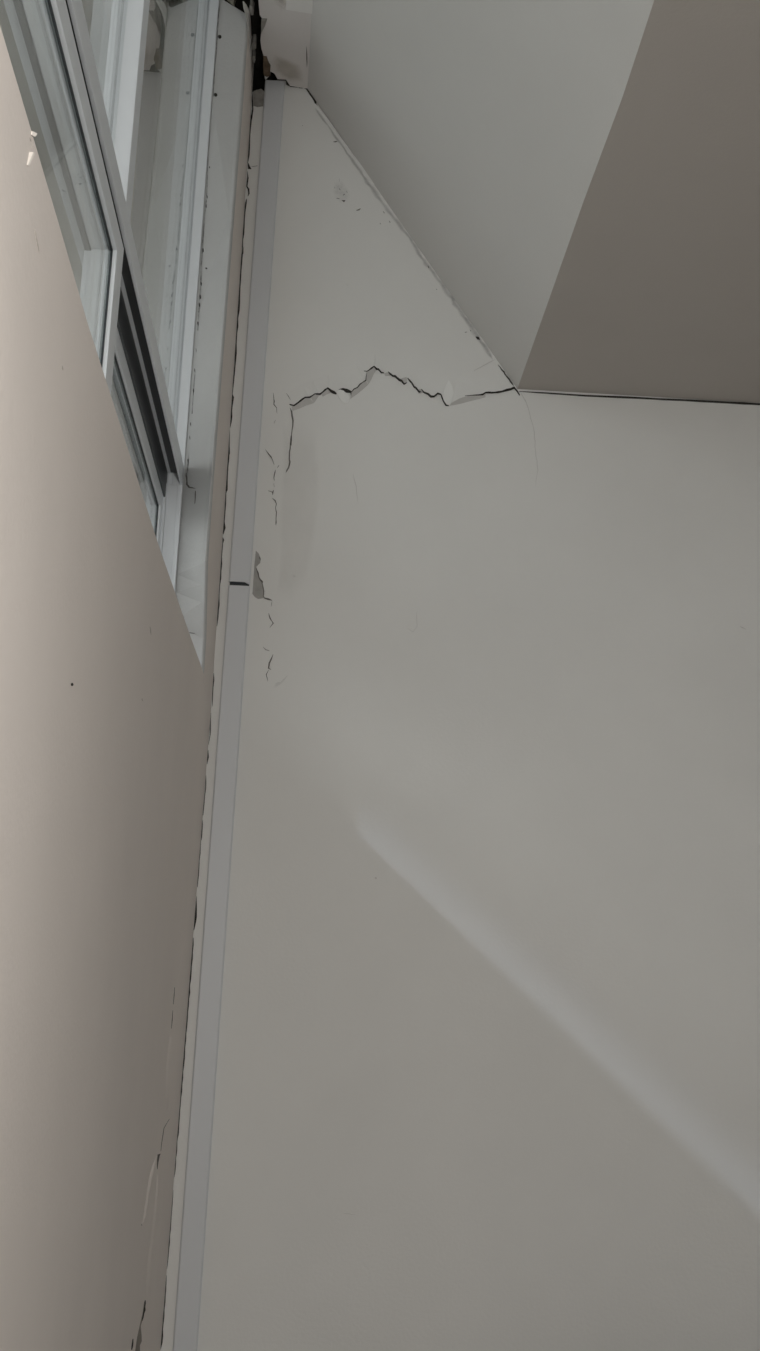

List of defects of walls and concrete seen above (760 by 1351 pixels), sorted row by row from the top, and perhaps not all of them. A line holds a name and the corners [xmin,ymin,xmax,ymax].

crack [306,47,390,224]
crack [185,94,254,634]
crack [265,330,760,523]
peeling [252,551,272,606]
crack [141,675,214,1347]
flaking render [131,1300,146,1351]